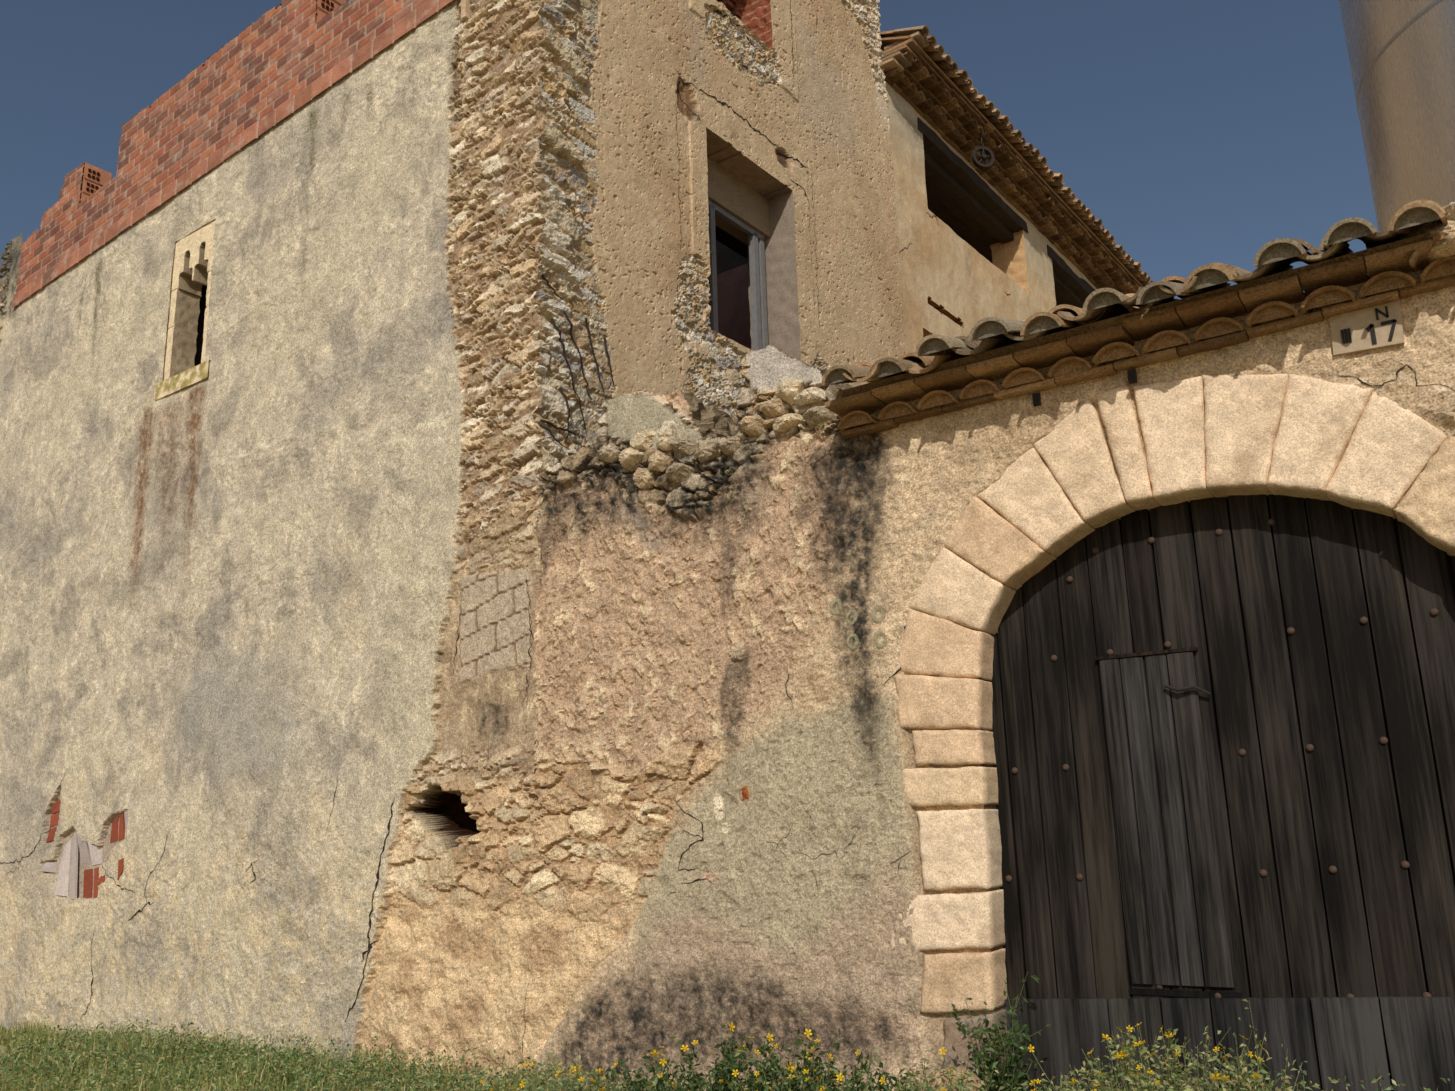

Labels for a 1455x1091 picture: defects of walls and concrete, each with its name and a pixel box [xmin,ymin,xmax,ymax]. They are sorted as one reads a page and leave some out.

rust [136,387,203,554]
spalling [445,0,875,602]
crack [676,0,820,327]
water stain [813,432,886,711]
crack [1337,358,1455,392]
spalling [37,777,130,906]
crack [345,797,395,1021]
spalling [354,742,722,1086]